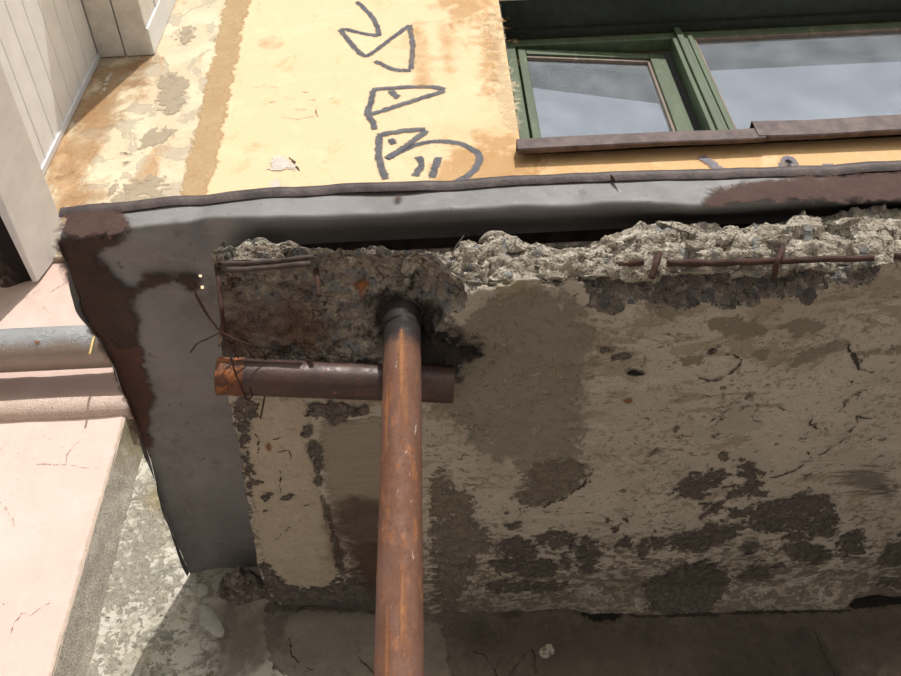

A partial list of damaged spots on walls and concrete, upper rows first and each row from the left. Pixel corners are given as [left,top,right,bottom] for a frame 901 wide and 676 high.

peeling [179,25,197,43]
peeling [137,71,190,150]
peeling [107,174,173,202]
corrosion [701,171,901,207]
corrosion [54,191,199,452]
corrosion [399,329,407,426]
spalling [211,204,901,514]
crack [699,346,742,382]
crack [771,343,871,478]
peeling [424,452,901,676]
peeling [117,625,168,652]
peeling [217,562,376,676]